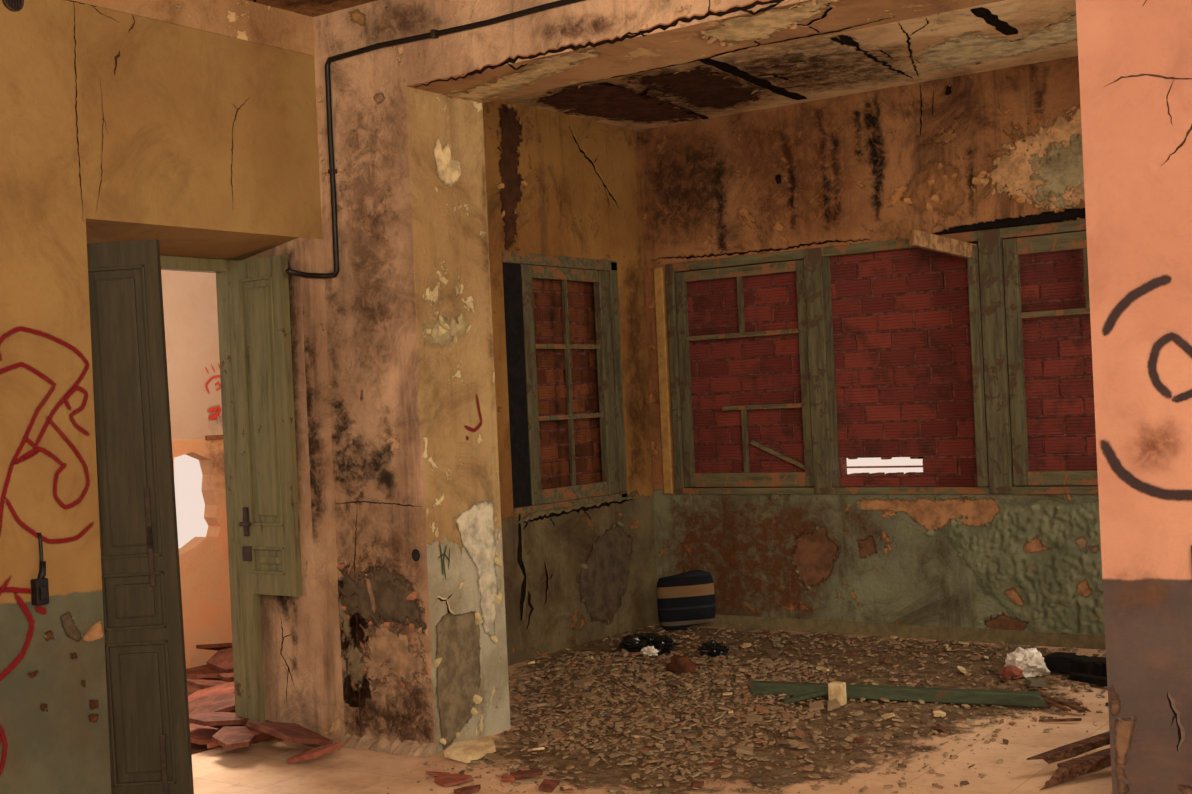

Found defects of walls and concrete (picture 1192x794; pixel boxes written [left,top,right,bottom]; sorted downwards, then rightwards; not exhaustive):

crack [68,0,135,212]
peeling [433,136,461,188]
flaking render [444,47,771,251]
crack [415,0,934,136]
water stain [650,148,725,248]
water stain [685,44,897,95]
water stain [854,101,885,218]
crack [971,7,1018,42]
peeling [932,105,1086,238]
crack [1106,74,1192,166]
peeling [856,496,1000,536]
peeling [336,499,503,750]